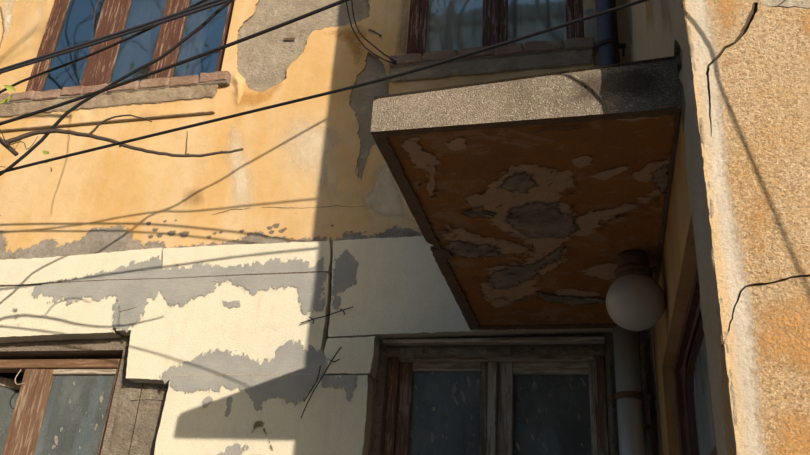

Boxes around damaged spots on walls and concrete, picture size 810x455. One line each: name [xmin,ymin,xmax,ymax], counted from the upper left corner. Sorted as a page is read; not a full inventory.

spalling [759,0,810,8]
spalling [0,84,218,117]
spalling [237,0,370,92]
spalling [349,52,389,179]
crack [706,3,758,135]
peeling [401,137,448,200]
spalling [146,220,189,238]
peeling [430,155,674,308]
crack [721,275,810,347]